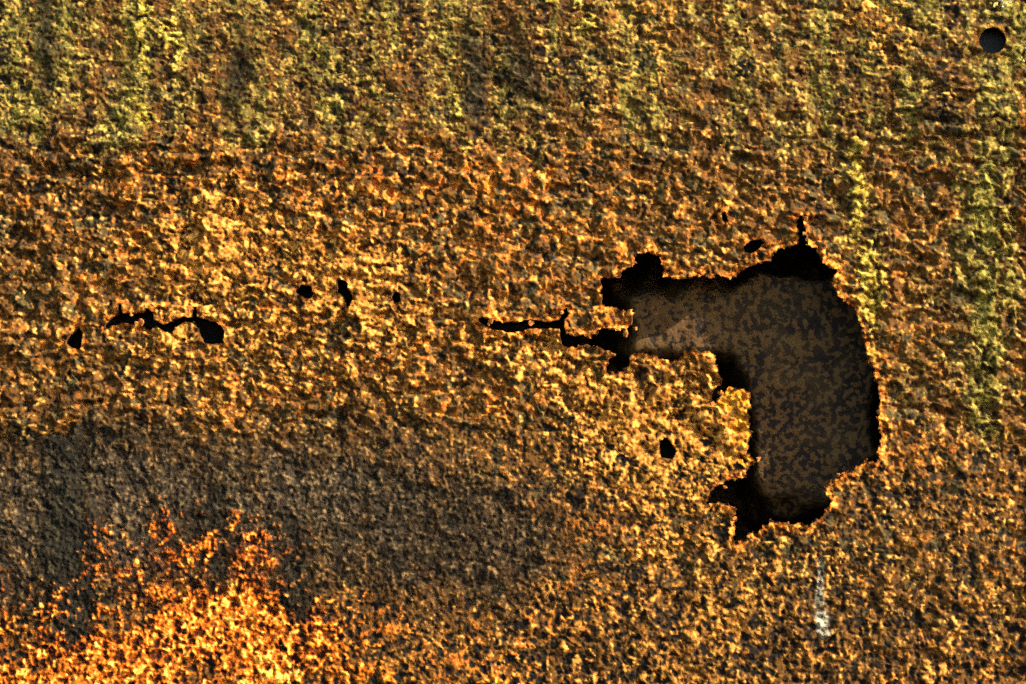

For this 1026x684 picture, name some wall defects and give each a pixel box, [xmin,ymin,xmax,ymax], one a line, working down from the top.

damp [126,0,186,129]
damp [574,0,598,36]
corrosion [843,0,911,74]
spalling [67,328,83,349]
corrosion [84,143,446,429]
spalling [296,285,314,299]
spalling [338,280,353,308]
crack [472,299,580,350]
spalling [660,438,676,459]
damp [0,411,536,665]
corrosion [461,325,876,684]
corrosion [0,507,401,684]